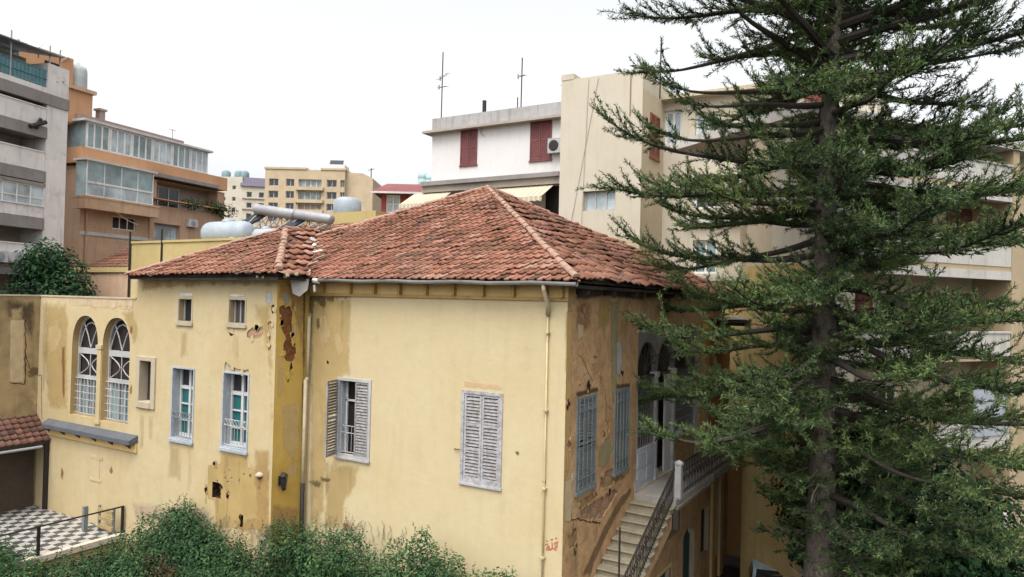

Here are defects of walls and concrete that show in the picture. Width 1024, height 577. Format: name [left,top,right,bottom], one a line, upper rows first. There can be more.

flaking render [247,293,298,382]
leakage [281,285,355,525]
spalling [204,461,260,499]